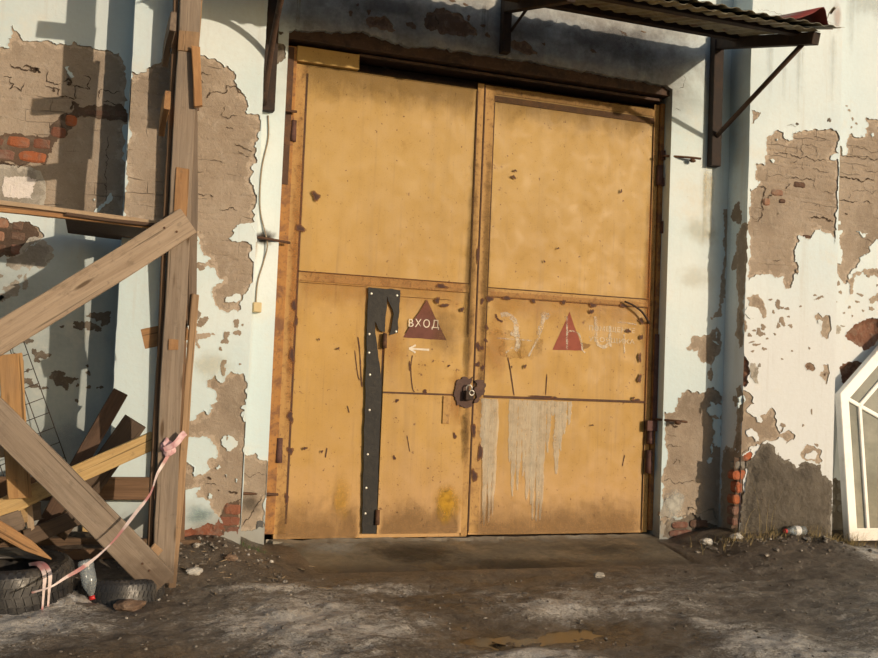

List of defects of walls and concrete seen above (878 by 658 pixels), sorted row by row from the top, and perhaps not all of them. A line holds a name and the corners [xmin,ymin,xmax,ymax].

peeling [349,0,490,39]
peeling [0,24,171,222]
peeling [0,216,54,302]
peeling [185,53,268,537]
peeling [657,105,878,539]